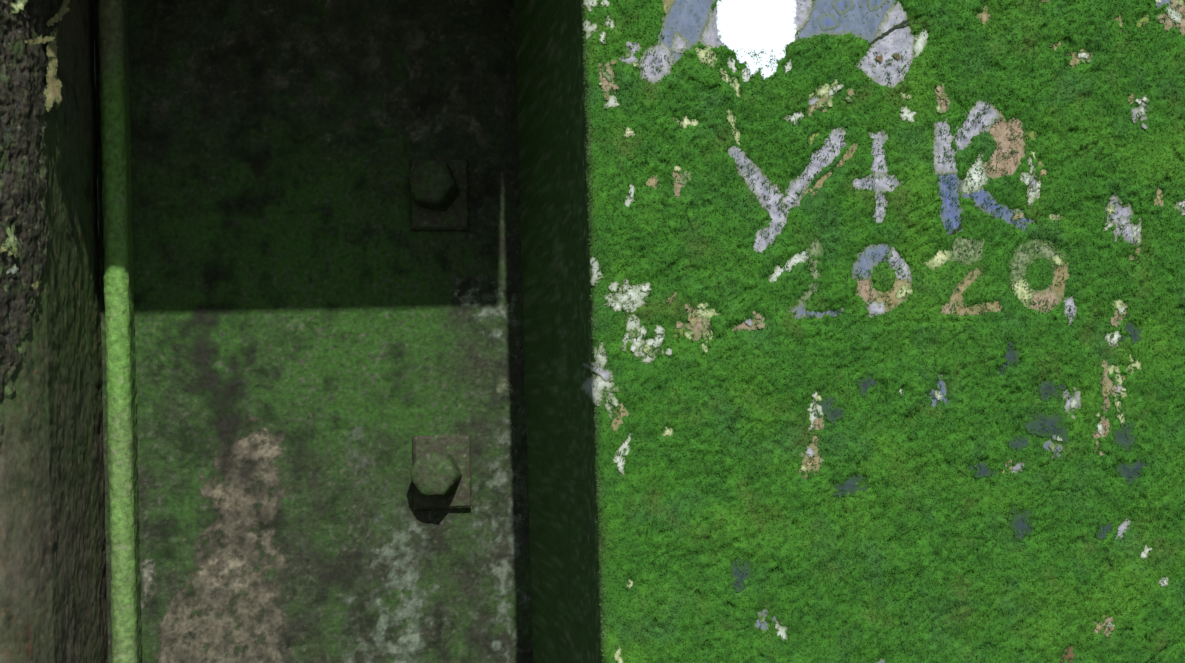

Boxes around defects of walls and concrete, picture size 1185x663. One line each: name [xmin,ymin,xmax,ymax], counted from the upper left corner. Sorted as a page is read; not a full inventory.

peeling [598,0,928,109]
flaking render [783,84,854,125]
peeling [899,106,917,122]
flaking render [934,84,951,114]
peeling [1009,157,1047,225]
peeling [590,257,712,364]
flaking render [732,311,766,331]
peeling [791,305,810,318]
peeling [580,342,633,475]